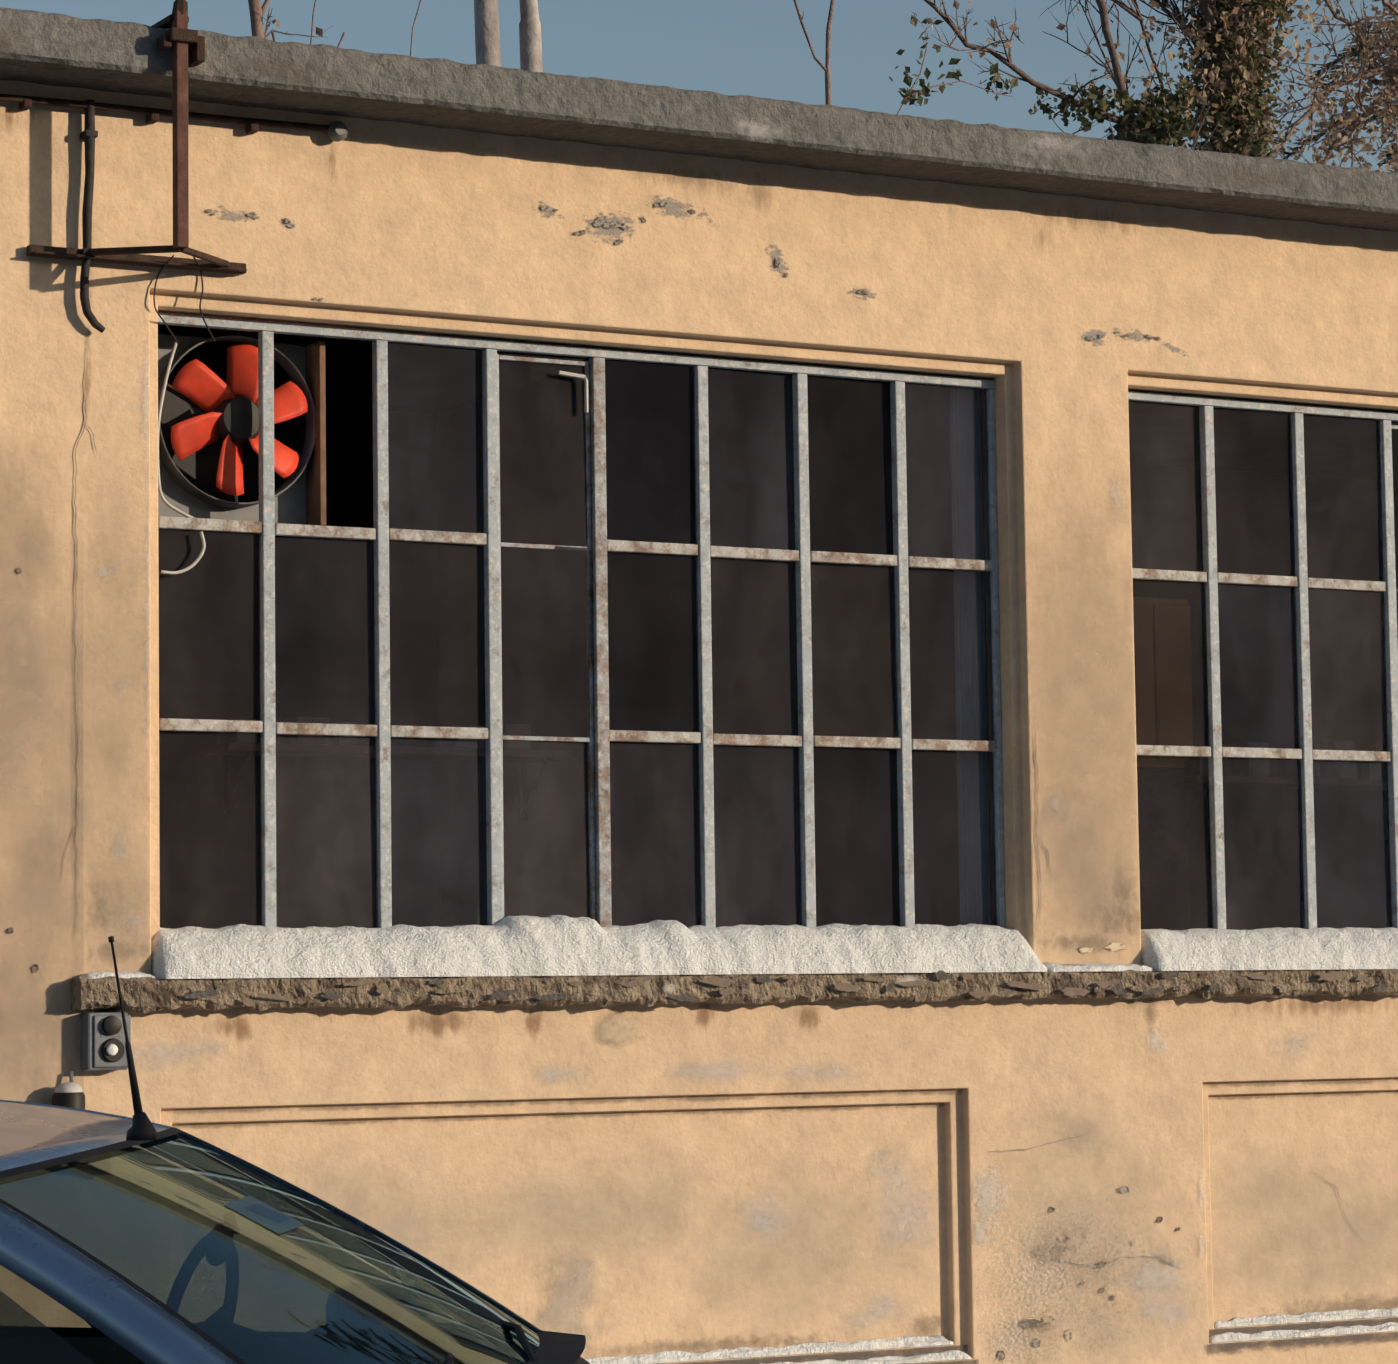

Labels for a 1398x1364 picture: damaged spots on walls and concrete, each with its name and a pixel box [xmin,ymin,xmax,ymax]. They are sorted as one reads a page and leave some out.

peeling [206,206,259,221]
peeling [539,201,561,218]
peeling [575,195,711,245]
peeling [765,245,789,277]
peeling [848,289,875,300]
peeling [1082,328,1186,356]
crack [60,347,97,968]